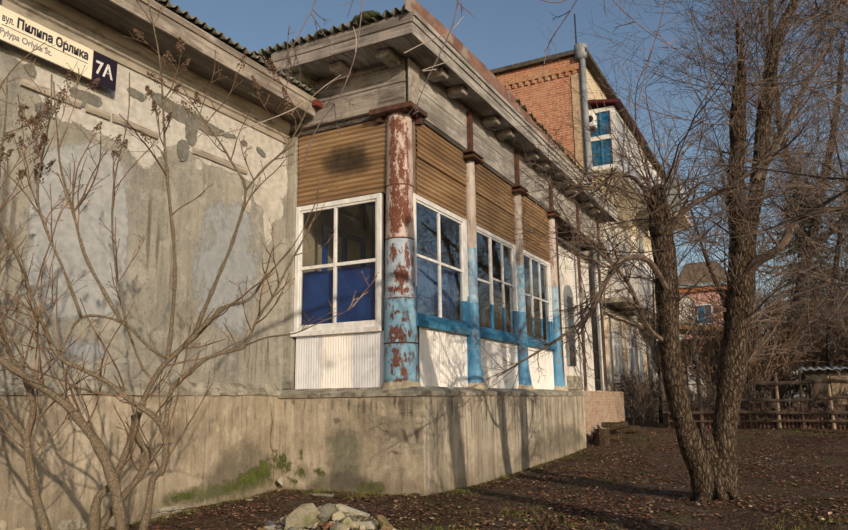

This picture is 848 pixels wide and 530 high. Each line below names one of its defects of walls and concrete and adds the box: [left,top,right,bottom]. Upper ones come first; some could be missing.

peeling [0,40,288,245]
rust [388,114,415,300]
rust [389,310,411,382]